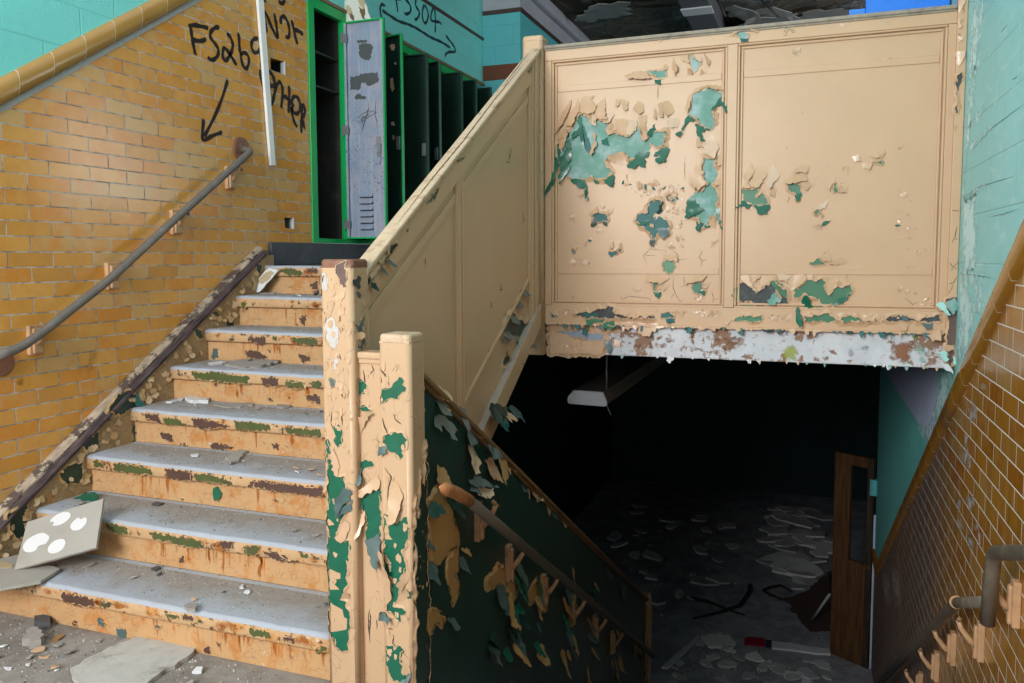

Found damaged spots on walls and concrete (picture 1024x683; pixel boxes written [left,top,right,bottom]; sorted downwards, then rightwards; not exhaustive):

peeling [544,52,727,298]
peeling [735,162,848,231]
peeling [500,286,531,372]
peeling [531,250,958,374]
damp [784,346,796,359]
damp [889,336,925,363]
peeling [0,228,472,683]
peeling [484,561,548,616]